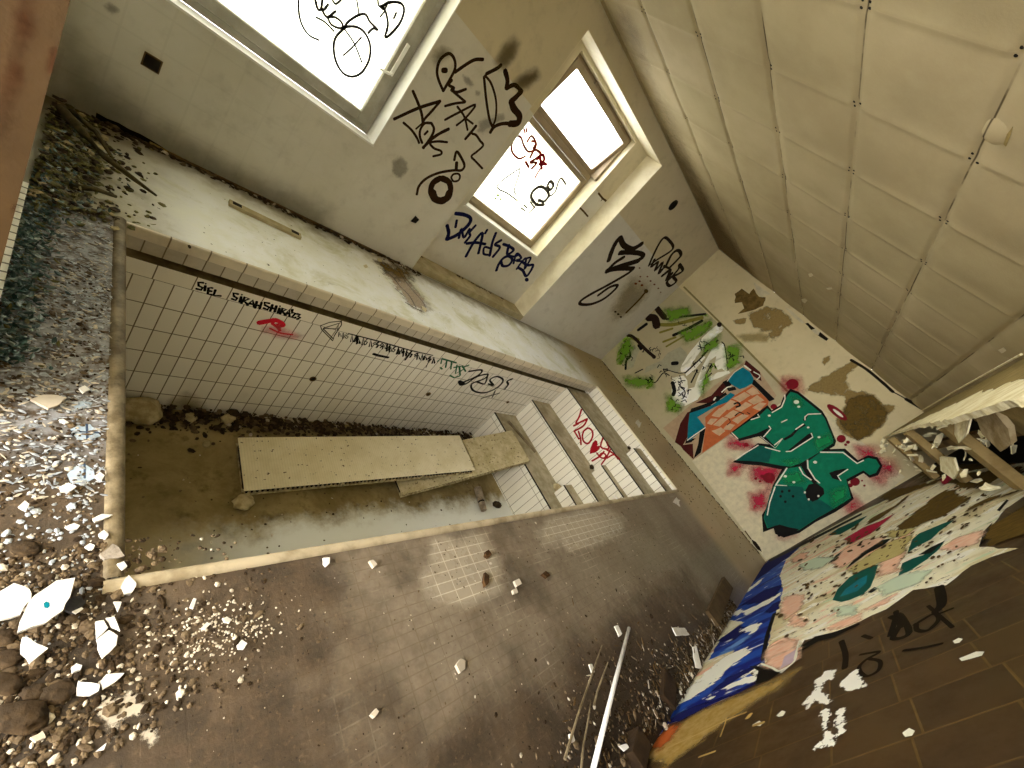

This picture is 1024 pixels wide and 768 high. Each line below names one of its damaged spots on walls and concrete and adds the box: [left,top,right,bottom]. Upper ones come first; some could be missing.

peeling [735,282,828,341]